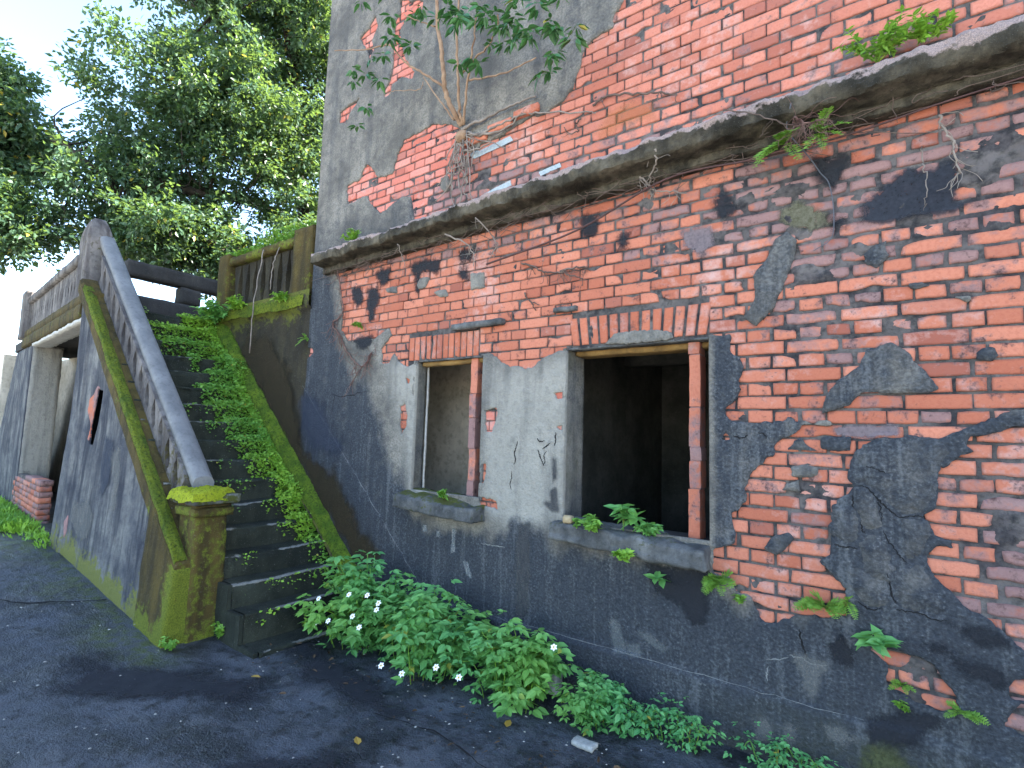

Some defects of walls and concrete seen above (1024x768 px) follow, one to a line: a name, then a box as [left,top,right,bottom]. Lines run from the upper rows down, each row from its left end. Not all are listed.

spalling [347,0,1024,219]
leakage [859,158,969,224]
mould [351,267,391,321]
mould [411,258,441,293]
mould [458,248,474,280]
spalling [337,83,1024,650]
crack [510,432,556,488]
crack [834,466,947,622]
leakage [647,563,712,626]
peeling [795,657,826,694]
spalling [871,648,958,711]
spalling [1005,679,1024,732]